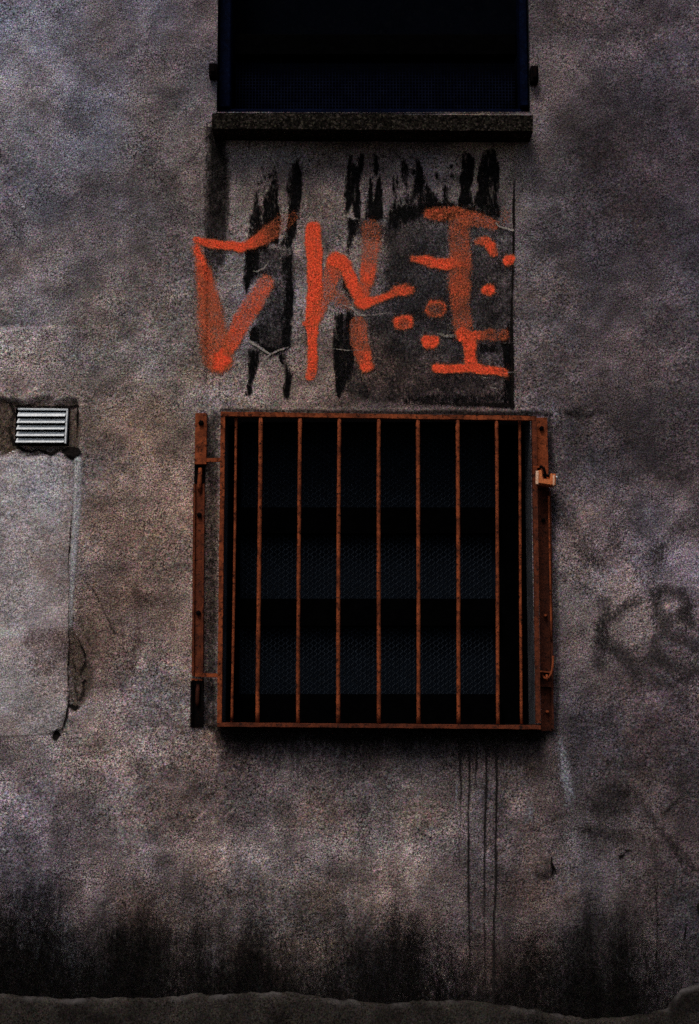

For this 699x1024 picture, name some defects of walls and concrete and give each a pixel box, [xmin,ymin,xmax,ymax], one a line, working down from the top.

crack [3,515,117,737]
leakage [0,408,666,1019]